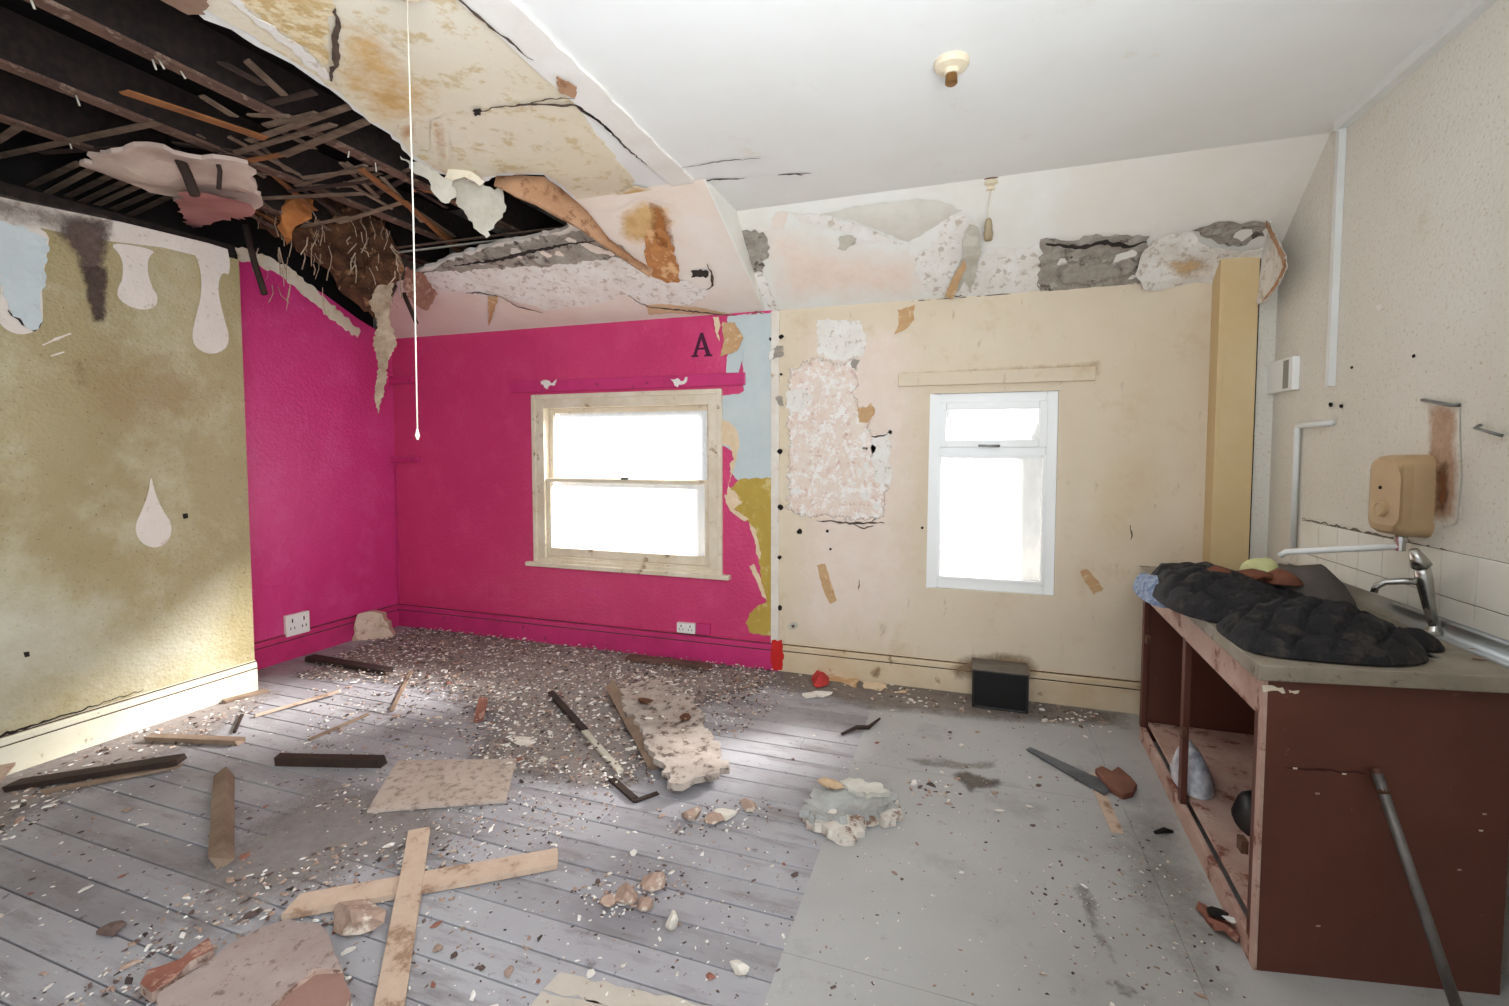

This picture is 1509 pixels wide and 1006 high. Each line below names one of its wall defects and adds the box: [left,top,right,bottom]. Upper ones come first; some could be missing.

peeling [206,0,634,200]
flaking render [421,230,744,373]
leakage [612,185,679,247]
flaking render [742,229,780,311]
flaking render [789,212,903,250]
flaking render [914,215,1288,305]
peeling [769,318,892,550]
corrosion [1425,399,1461,527]